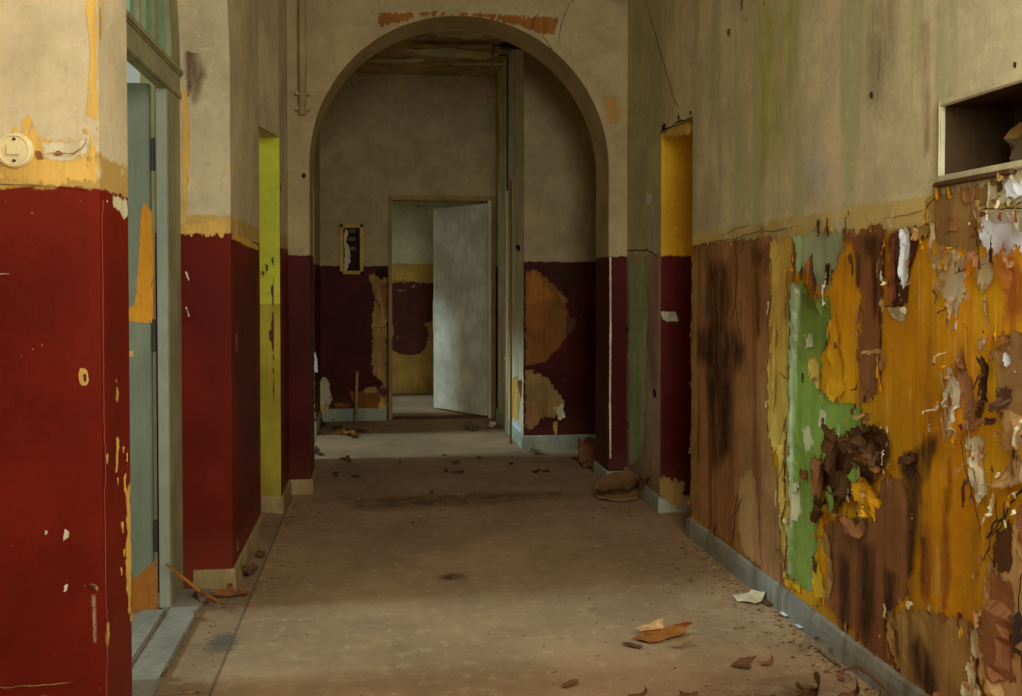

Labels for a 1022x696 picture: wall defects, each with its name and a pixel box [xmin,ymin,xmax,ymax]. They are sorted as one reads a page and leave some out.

peeling [0,0,102,187]
peeling [378,11,558,35]
flaking render [366,31,578,435]
peeling [314,264,434,420]
peeling [626,257,656,470]
peeling [659,172,1022,696]
peeling [106,438,132,624]